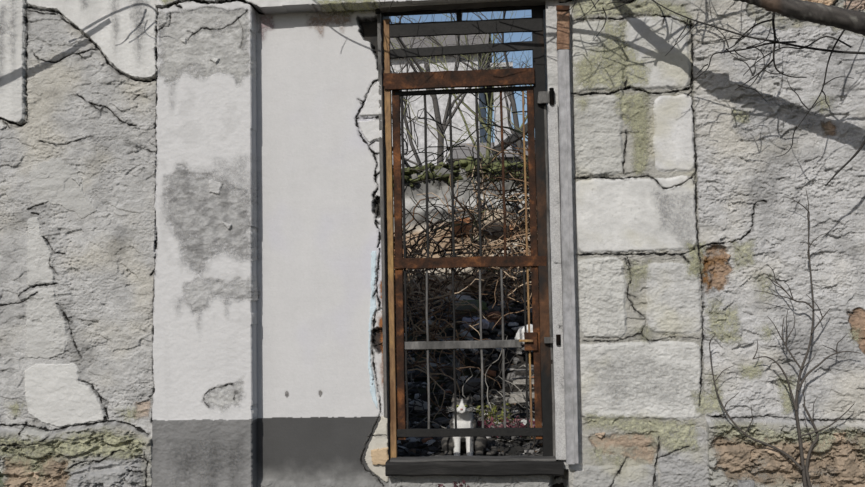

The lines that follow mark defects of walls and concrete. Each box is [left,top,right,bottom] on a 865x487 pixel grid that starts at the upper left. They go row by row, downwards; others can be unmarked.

spalling [358,18,382,59]
spalling [746,4,865,38]
spalling [804,0,865,12]
peeling [359,82,383,143]
crack [0,0,265,301]
crack [559,0,864,421]
crack [0,236,82,357]
spalling [848,308,865,354]
peeling [365,251,389,482]
crack [0,381,153,487]
crack [653,437,689,487]
spalling [712,430,865,487]